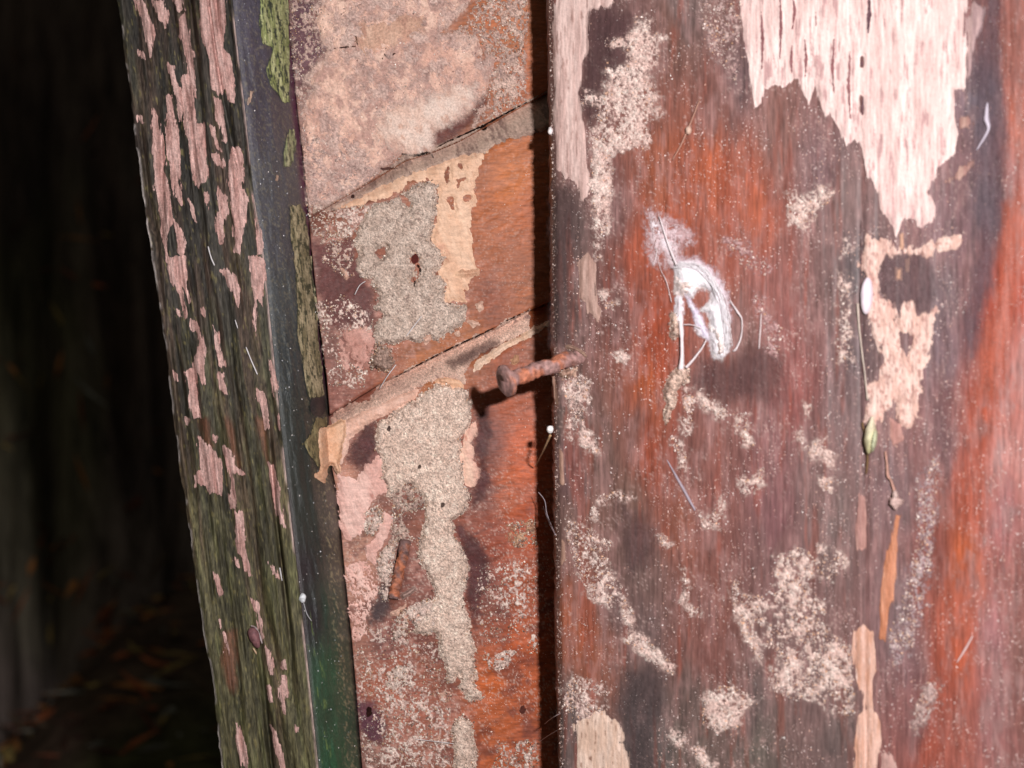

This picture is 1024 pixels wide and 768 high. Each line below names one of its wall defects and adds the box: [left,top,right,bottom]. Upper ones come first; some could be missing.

peeling [259,0,290,103]
peeling [134,0,267,426]
peeling [290,204,325,398]
peeling [337,151,489,345]
peeling [740,0,986,446]
peeling [194,434,253,577]
peeling [255,359,280,431]
peeling [302,388,419,642]
peeling [460,421,481,487]
peeling [250,597,289,715]
peeling [235,723,249,768]
peeling [269,724,285,768]